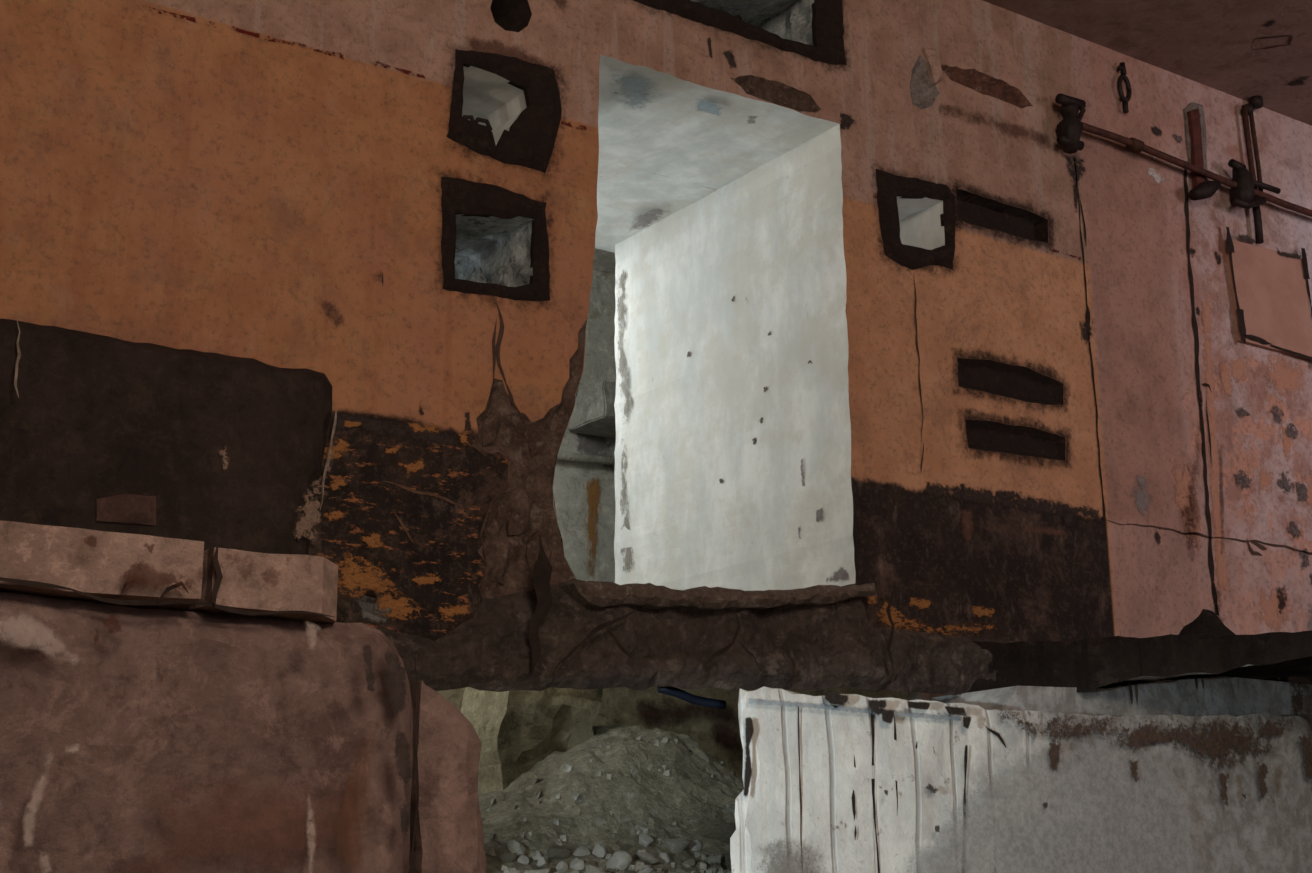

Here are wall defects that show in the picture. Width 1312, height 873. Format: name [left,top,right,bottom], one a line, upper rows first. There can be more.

peeling [617,271,633,422]
peeling [323,421,362,460]
spalling [334,319,587,622]
peeling [620,450,630,530]
leakage [924,482,1100,527]
corrosion [585,478,600,575]
peeling [621,547,633,571]
peeling [867,595,999,637]
leakage [1049,740,1062,772]
leakage [1129,760,1139,782]
leakage [1219,773,1229,805]
leakage [1257,760,1269,799]